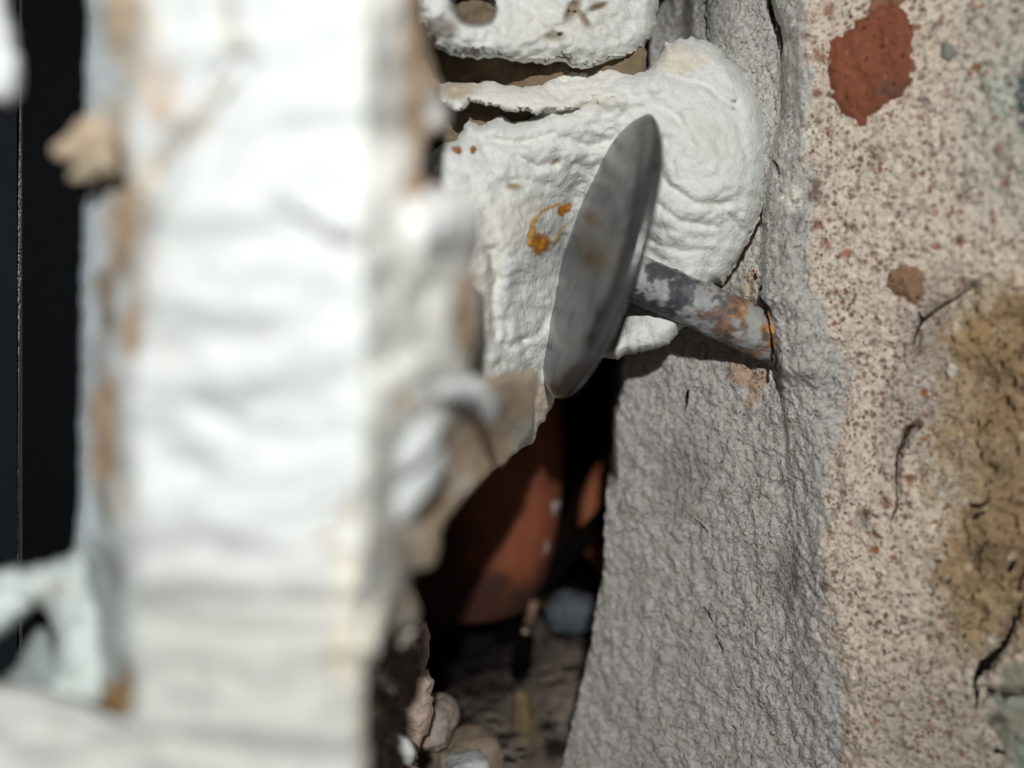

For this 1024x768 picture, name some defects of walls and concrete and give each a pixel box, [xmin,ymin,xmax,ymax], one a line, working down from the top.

flaking render [825,0,914,126]
corrosion [527,203,571,254]
crack [720,204,765,289]
crack [891,424,921,521]
crack [1000,559,1019,588]
crack [974,611,1024,708]